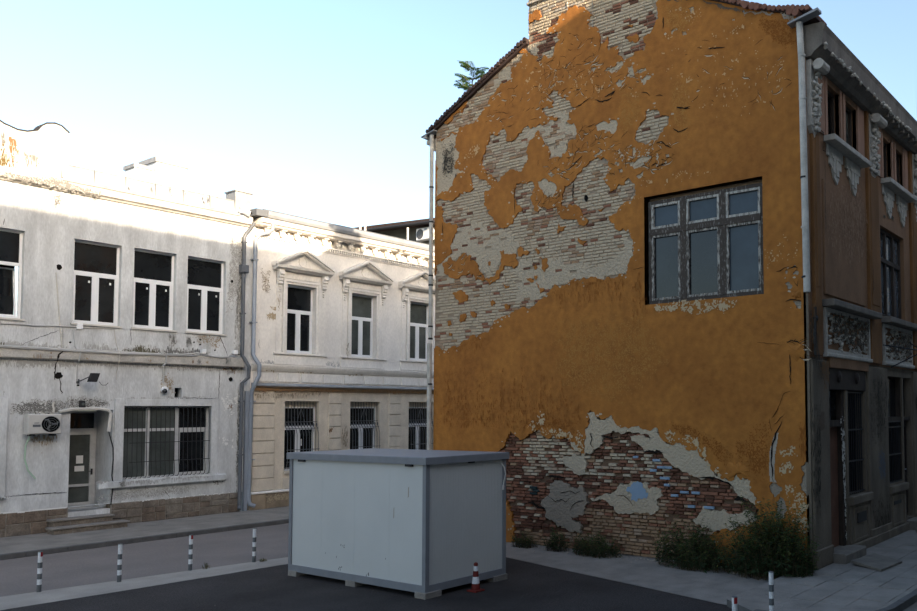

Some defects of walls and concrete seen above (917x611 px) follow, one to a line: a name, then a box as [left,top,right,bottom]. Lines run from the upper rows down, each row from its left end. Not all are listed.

peeling [692,19,784,110]
flaking render [434,0,690,353]
damp [0,152,247,505]
peeling [654,299,737,315]
crack [757,337,811,482]
flaking render [499,411,760,557]
flaking render [770,446,809,533]